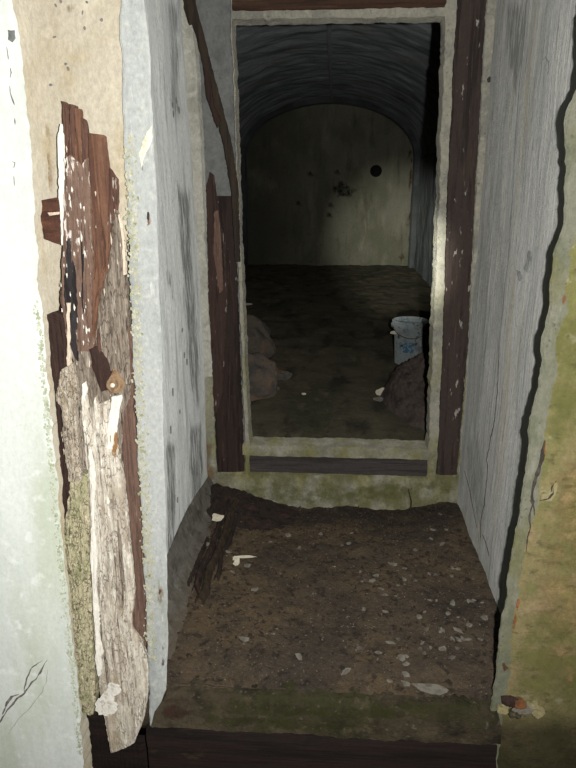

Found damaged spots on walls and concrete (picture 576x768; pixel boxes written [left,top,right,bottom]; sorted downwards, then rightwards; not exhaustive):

peeling [139,126,152,170]
peeling [33,300,122,755]
crack [526,441,546,553]
crack [0,662,48,731]